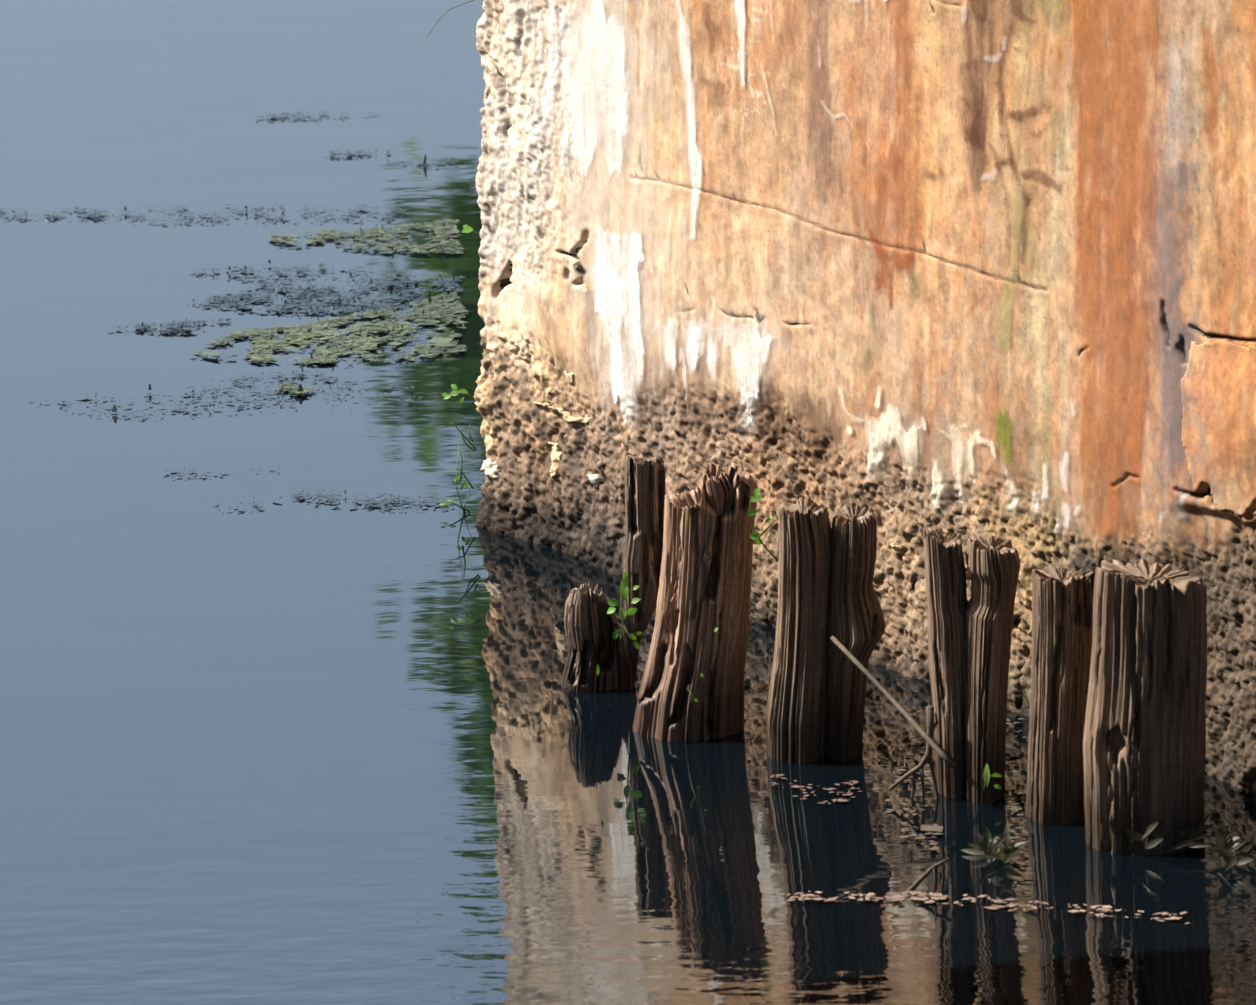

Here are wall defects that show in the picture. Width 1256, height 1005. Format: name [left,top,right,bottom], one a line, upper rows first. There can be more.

efflorescence [540,0,627,175]
efflorescence [680,10,701,238]
crack [633,144,1047,290]
corrosion [869,142,918,308]
water stain [587,227,644,422]
water stain [666,322,715,370]
water stain [723,327,771,429]
crack [1164,315,1253,358]
water stain [867,389,926,479]
efflorescence [931,462,942,509]
efflorescence [955,431,994,501]
water stain [1006,473,1018,512]